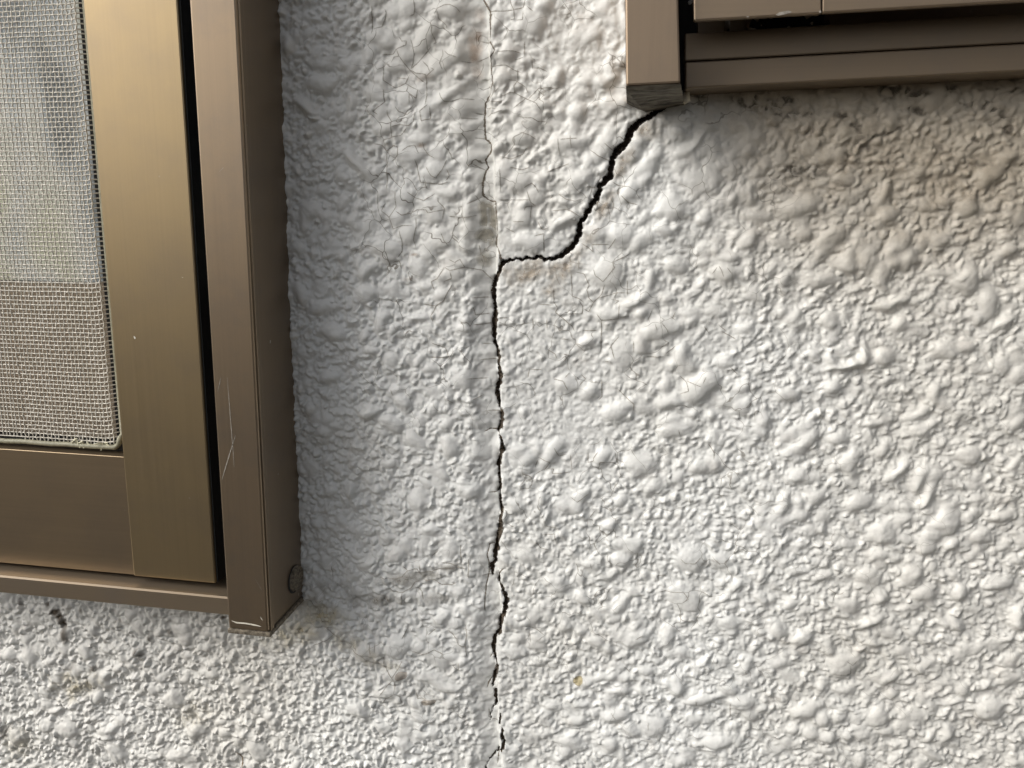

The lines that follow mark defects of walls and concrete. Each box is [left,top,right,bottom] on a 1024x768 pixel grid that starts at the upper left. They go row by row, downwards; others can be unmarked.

crack [305,0,675,768]